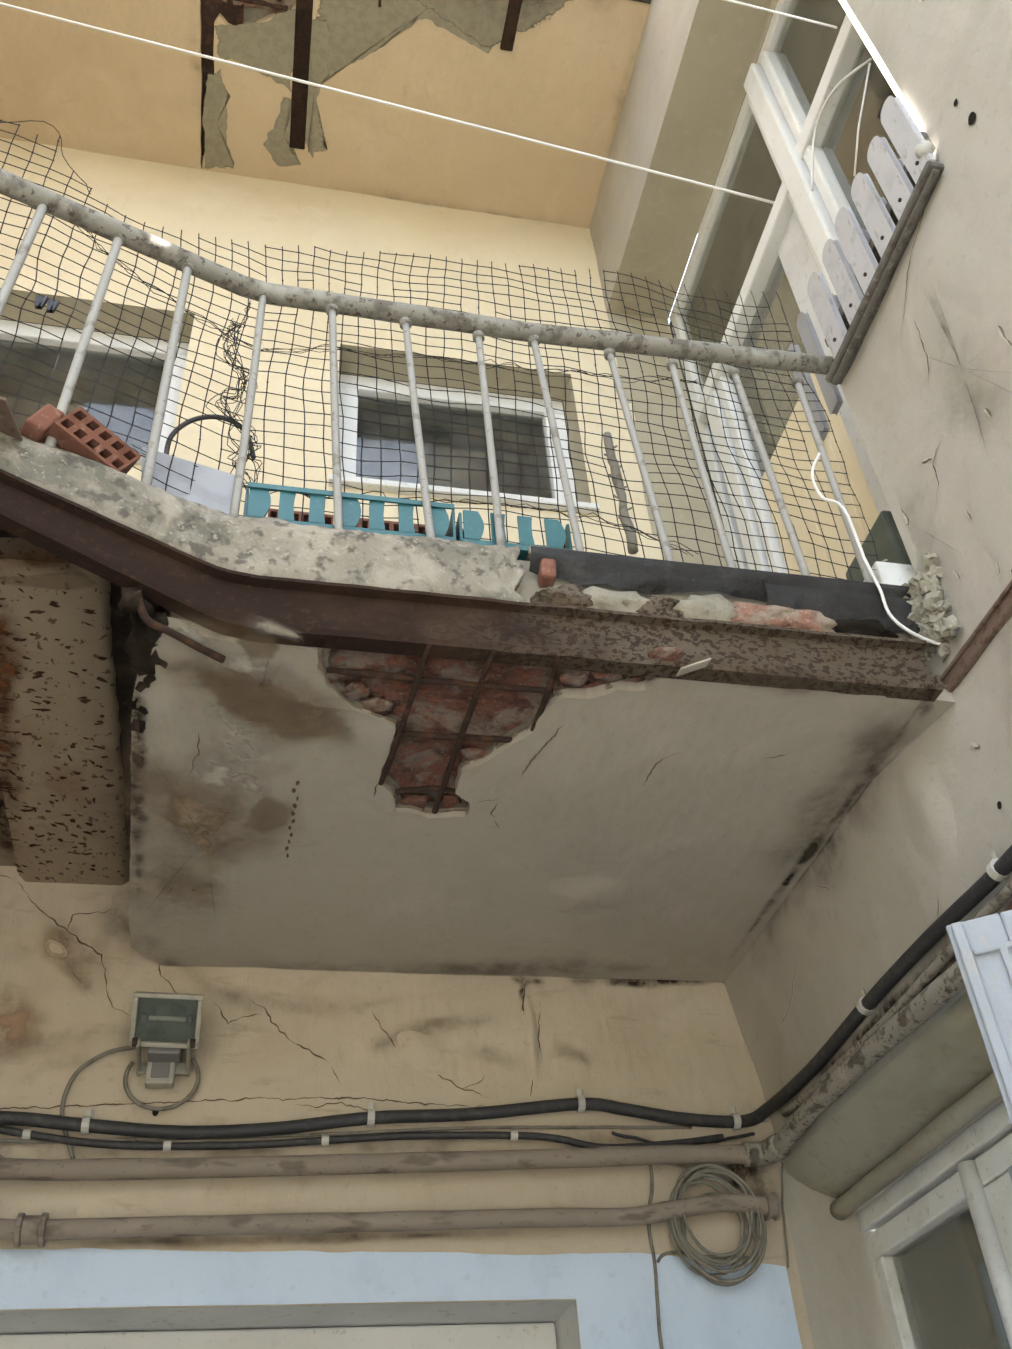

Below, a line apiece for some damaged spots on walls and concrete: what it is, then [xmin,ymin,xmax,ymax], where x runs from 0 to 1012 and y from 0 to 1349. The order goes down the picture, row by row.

peeling [201,0,568,168]
corrosion [0,554,114,873]
spalling [317,643,657,814]
spalling [647,647,711,676]
damp [783,834,833,886]
crack [0,875,130,1016]
crack [157,964,177,993]
crack [0,1000,490,1112]
crack [520,981,542,1096]